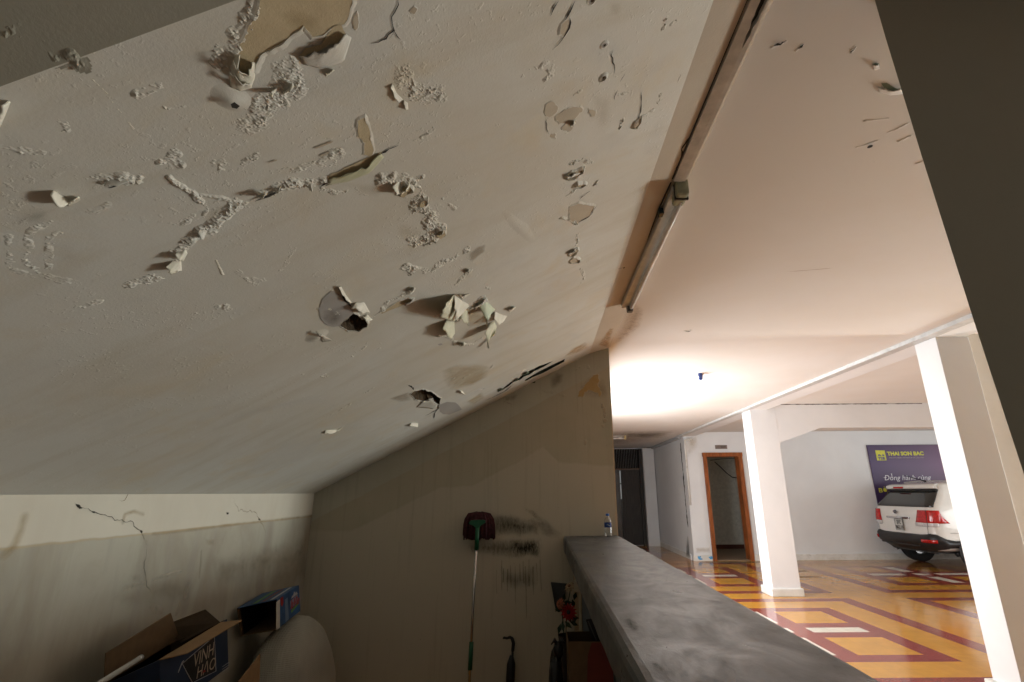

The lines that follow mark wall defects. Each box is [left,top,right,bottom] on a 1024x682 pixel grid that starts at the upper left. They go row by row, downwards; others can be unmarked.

peeling [208,0,359,134]
peeling [543,89,597,139]
peeling [122,113,457,289]
peeling [559,157,599,287]
spalling [316,246,471,332]
peeling [436,269,516,349]
spalling [409,385,462,417]
crack [487,359,565,400]
crack [75,494,151,592]